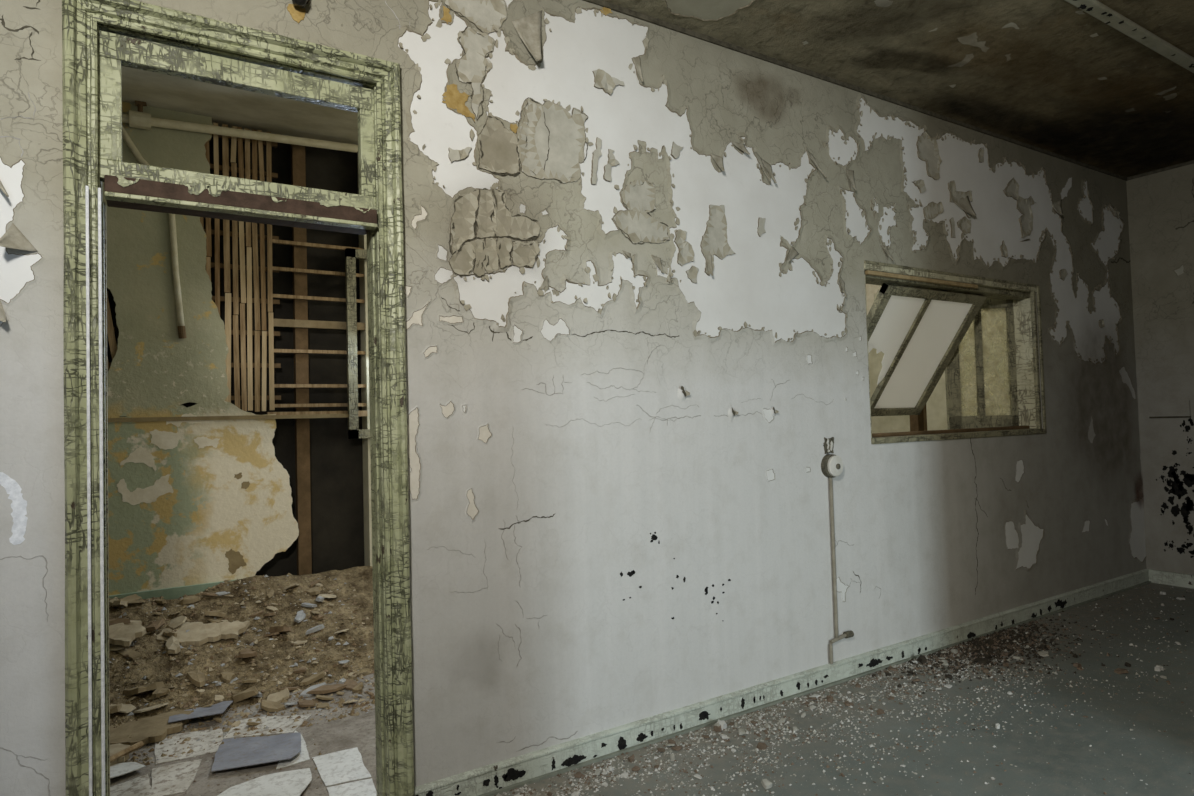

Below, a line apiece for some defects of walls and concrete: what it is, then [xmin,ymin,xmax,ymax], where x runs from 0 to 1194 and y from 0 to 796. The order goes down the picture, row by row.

peeling [0,154,45,329]
peeling [393,0,1146,400]
peeling [116,413,220,505]
leakage [1156,417,1194,558]
spalling [225,549,246,574]
peeling [1004,510,1045,572]
peeling [483,768,526,789]
peeling [551,723,683,770]